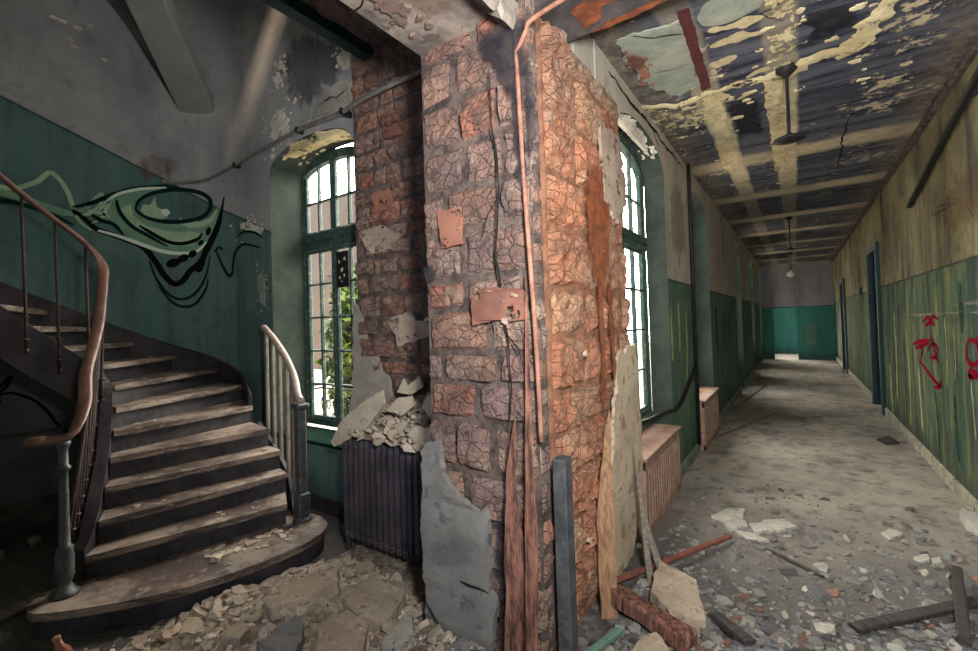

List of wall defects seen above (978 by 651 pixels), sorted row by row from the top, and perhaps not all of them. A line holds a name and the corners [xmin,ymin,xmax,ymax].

peeling [641,0,900,139]
crack [838,108,855,169]
flaking render [262,0,657,651]